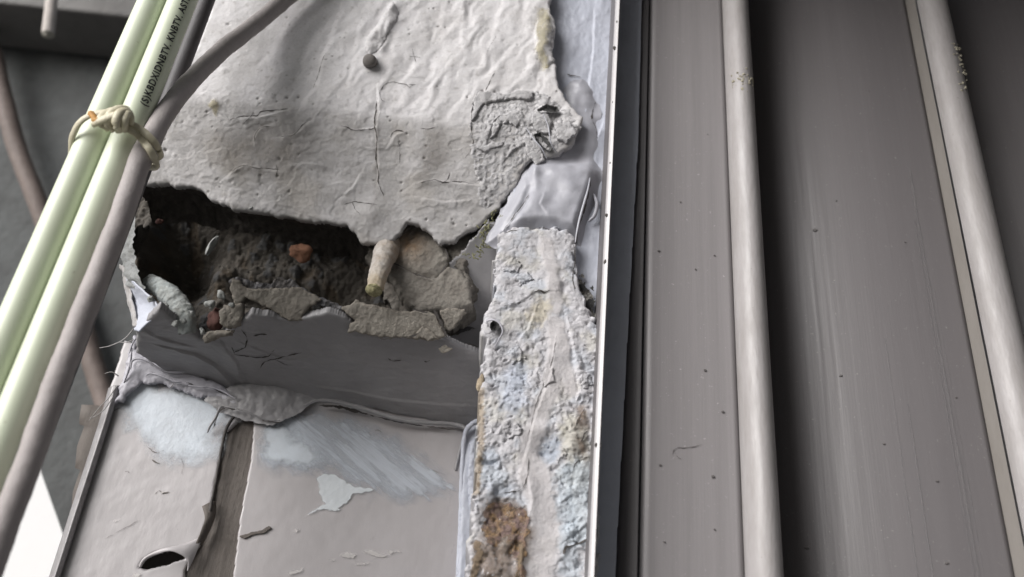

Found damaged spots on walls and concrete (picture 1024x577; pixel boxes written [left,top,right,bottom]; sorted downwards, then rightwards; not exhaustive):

crack [229,108,305,141]
crack [343,49,435,214]
peeling [442,90,582,247]
spalling [132,186,477,353]
corrosion [470,500,530,577]